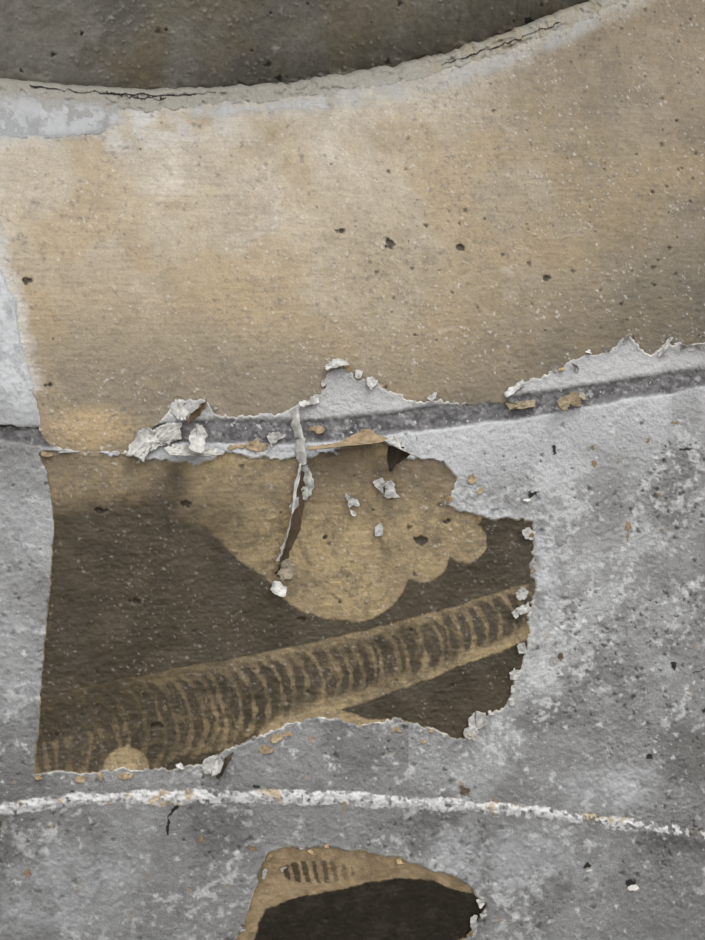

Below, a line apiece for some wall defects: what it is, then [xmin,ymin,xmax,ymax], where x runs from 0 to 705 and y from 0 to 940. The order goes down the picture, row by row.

crack [442,22,560,65]
peeling [0,0,705,623]
peeling [33,518,536,783]
peeling [235,843,487,940]